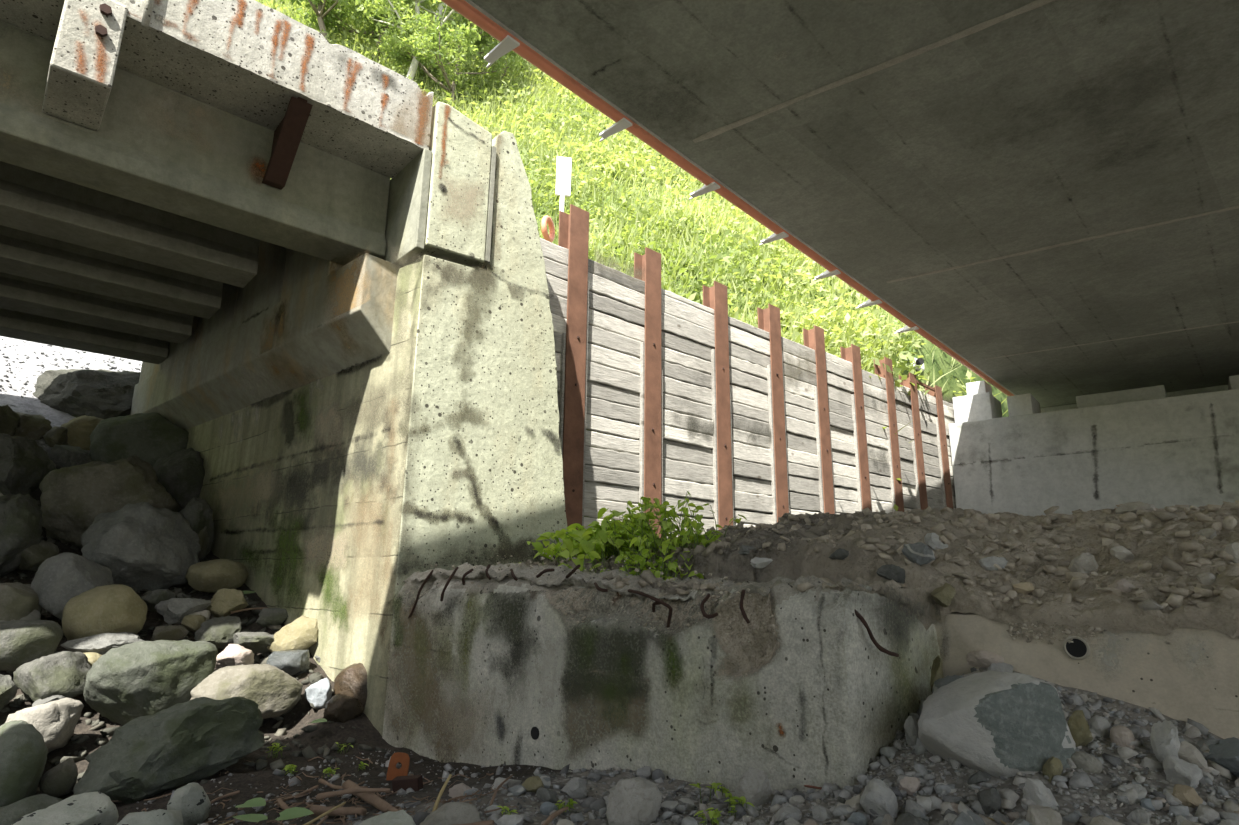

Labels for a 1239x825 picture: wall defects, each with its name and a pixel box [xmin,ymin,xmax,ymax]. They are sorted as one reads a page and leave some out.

corrosion [77,12,106,83]
corrosion [229,0,262,42]
corrosion [272,20,290,58]
corrosion [301,35,314,91]
corrosion [345,59,361,112]
damp [393,251,494,380]
damp [448,402,482,424]
damp [217,376,429,623]
spalling [405,552,780,678]
damp [387,592,648,763]